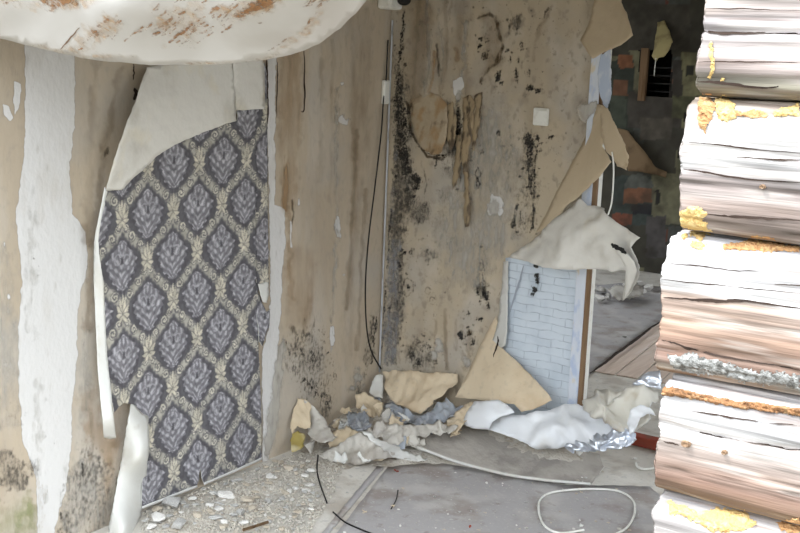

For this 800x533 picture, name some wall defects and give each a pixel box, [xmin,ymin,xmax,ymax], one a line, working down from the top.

rust [40,0,78,11]
rust [124,0,273,43]
leakage [475,7,524,84]
peeling [579,49,612,121]
leakage [365,12,463,366]
flaking render [3,45,88,533]
leakage [283,327,331,413]